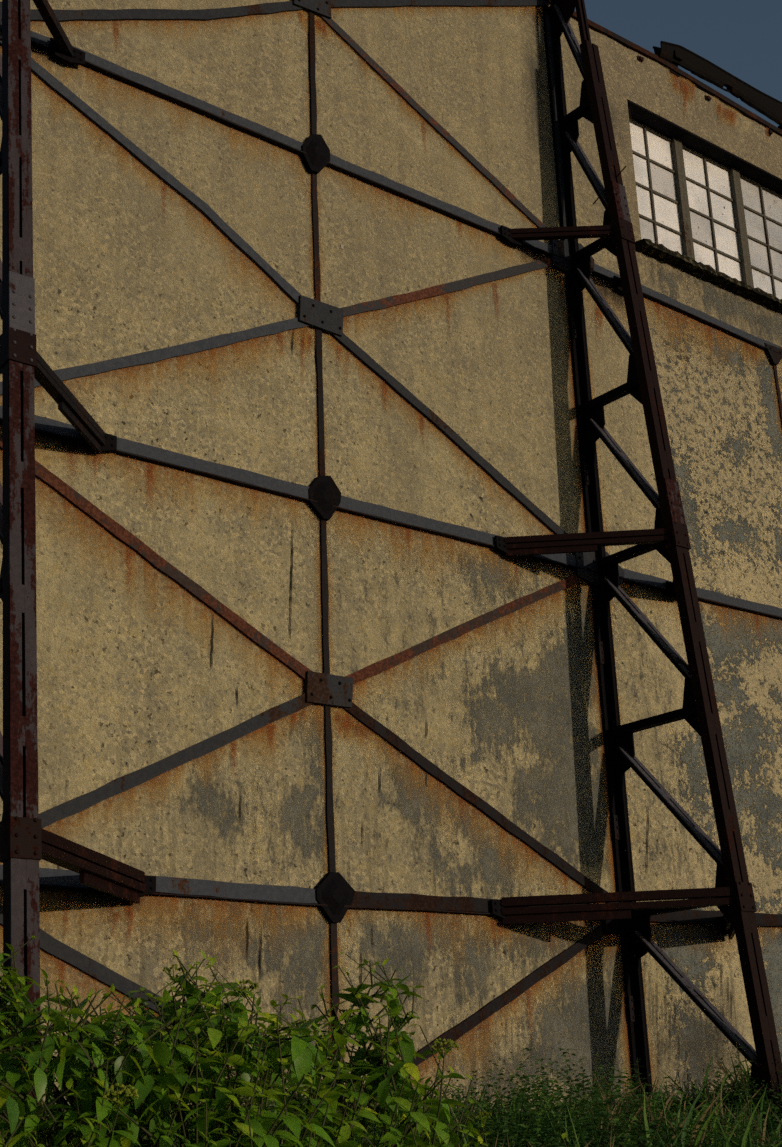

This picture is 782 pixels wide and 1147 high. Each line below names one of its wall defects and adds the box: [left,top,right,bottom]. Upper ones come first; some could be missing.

corrosion [31,46,301,308]
corrosion [643,297,762,353]
peeling [649,260,782,1061]
peeling [644,899,742,1093]